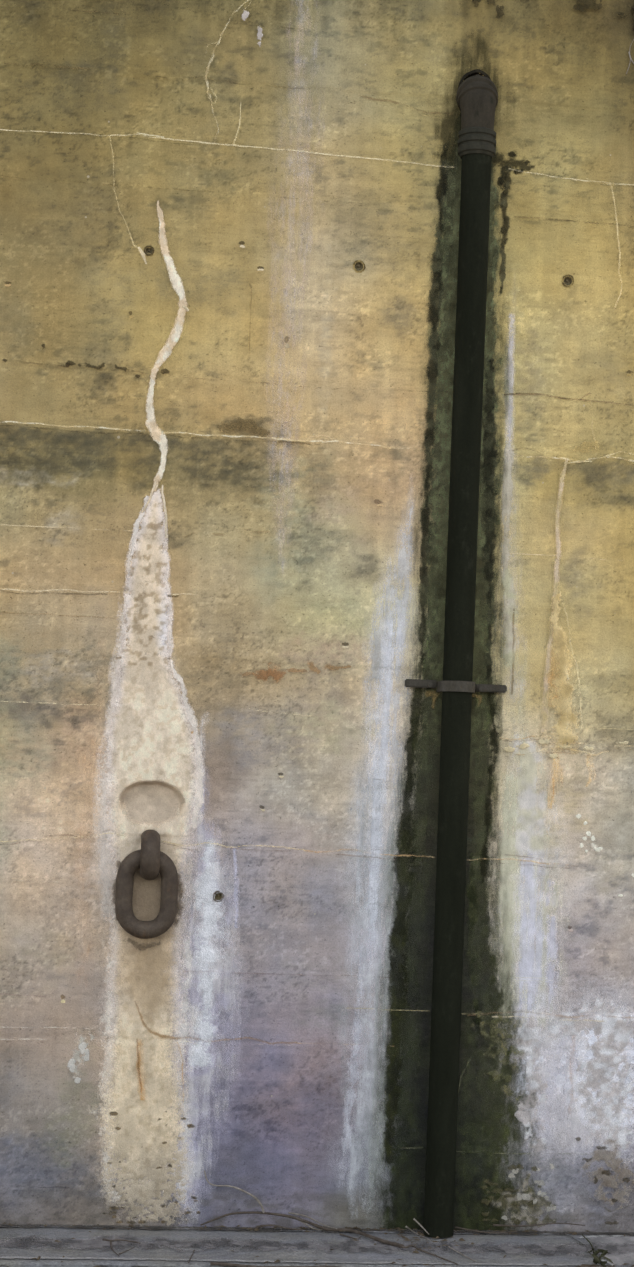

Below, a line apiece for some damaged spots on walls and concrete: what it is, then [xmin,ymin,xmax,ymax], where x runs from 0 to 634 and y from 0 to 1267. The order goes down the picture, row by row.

damp [96,491,237,1225]
damp [346,35,499,1187]
damp [500,167,512,294]
damp [467,341,634,1163]